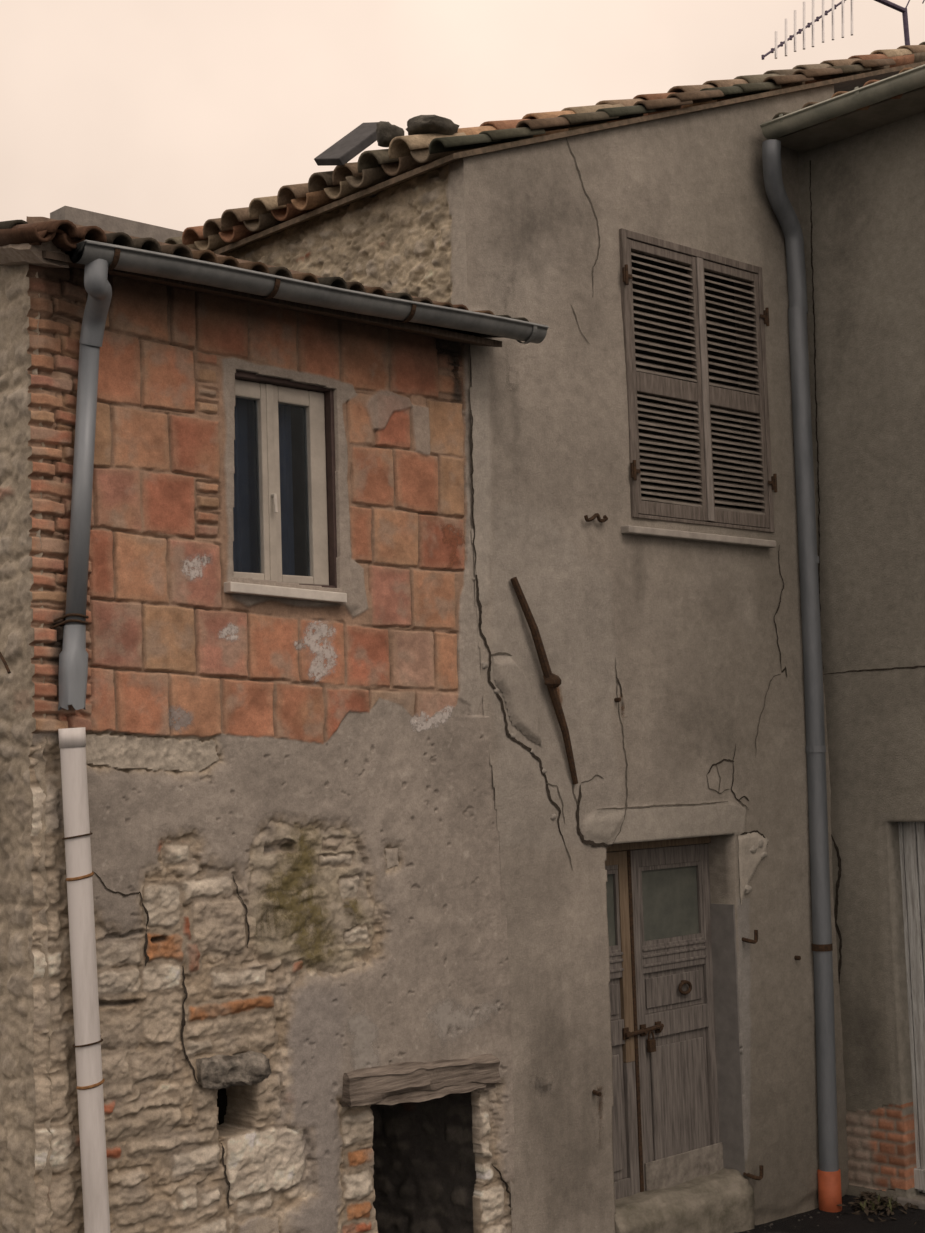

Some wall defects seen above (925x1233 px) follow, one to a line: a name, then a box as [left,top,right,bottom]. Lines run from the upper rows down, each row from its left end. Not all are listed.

crack [566,137,600,281]
crack [809,160,925,682]
crack [470,410,787,871]
flaking render [28,745,84,1233]
crack [92,871,149,966]
crack [181,967,197,1082]
flaking render [94,820,385,1233]
crack [233,876,250,948]
spalling [738,832,769,904]
crack [831,835,842,983]
crack [221,1143,230,1208]
flaking render [846,1102,917,1192]